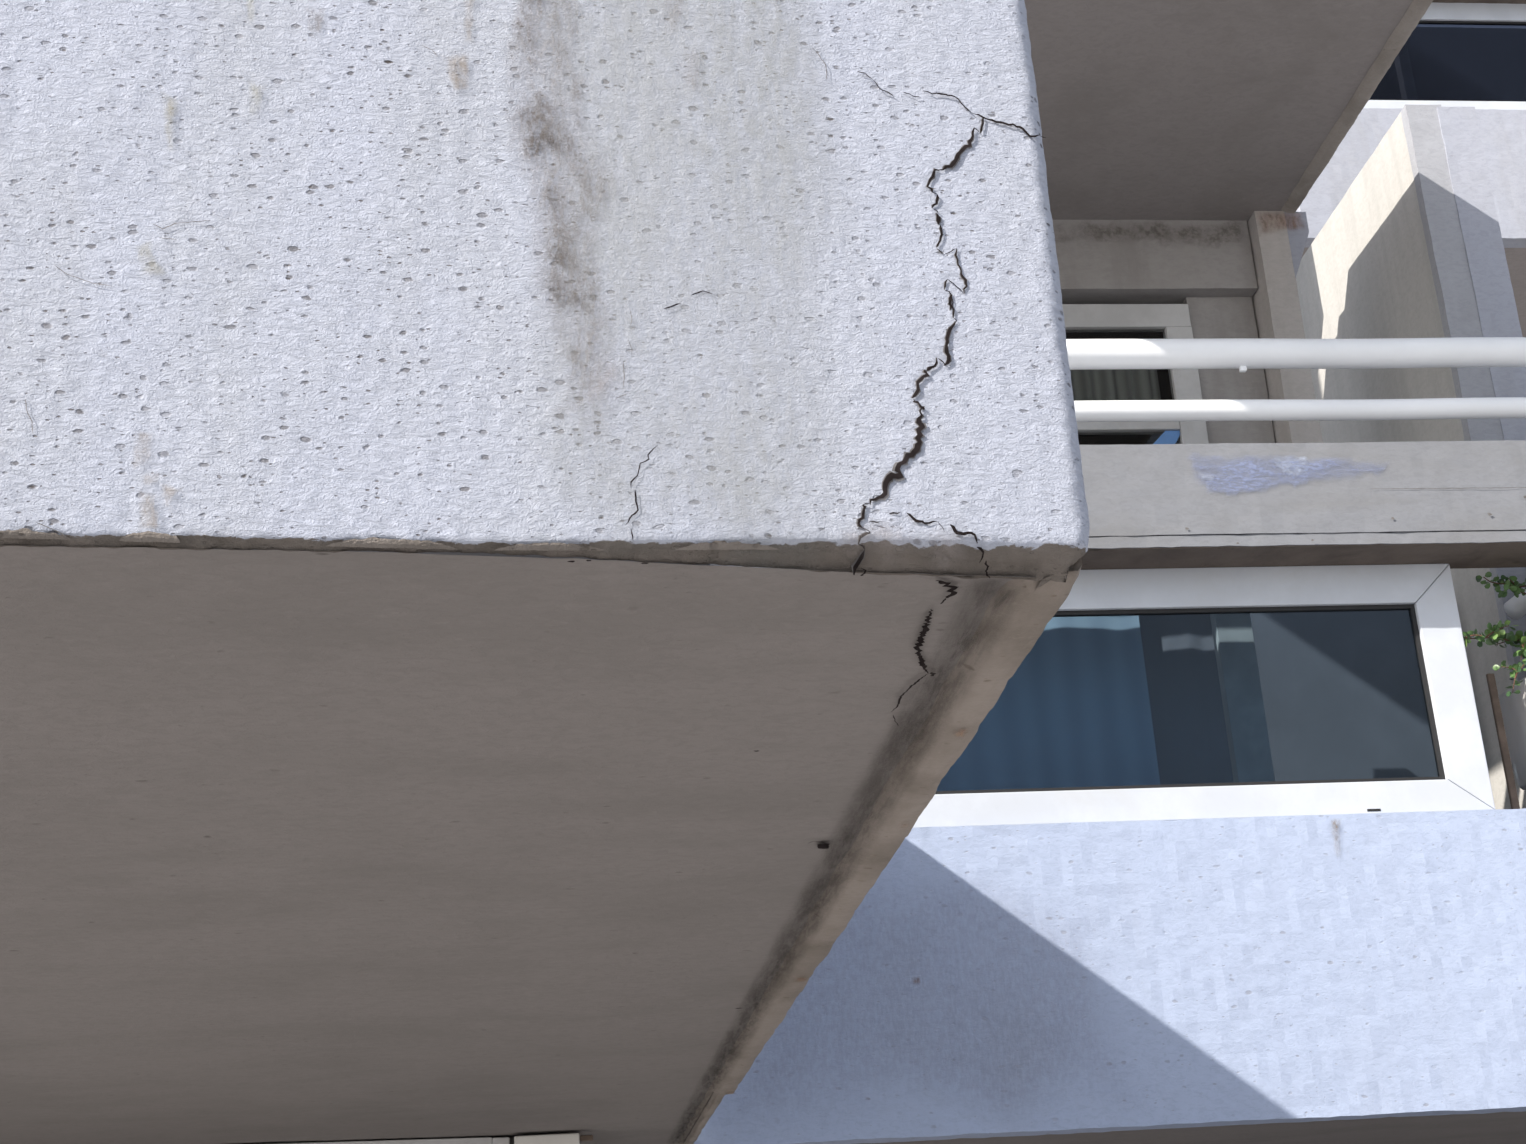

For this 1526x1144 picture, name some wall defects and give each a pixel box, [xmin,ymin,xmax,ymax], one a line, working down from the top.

crack [815,50,1046,725]
water stain [675,638,973,1144]